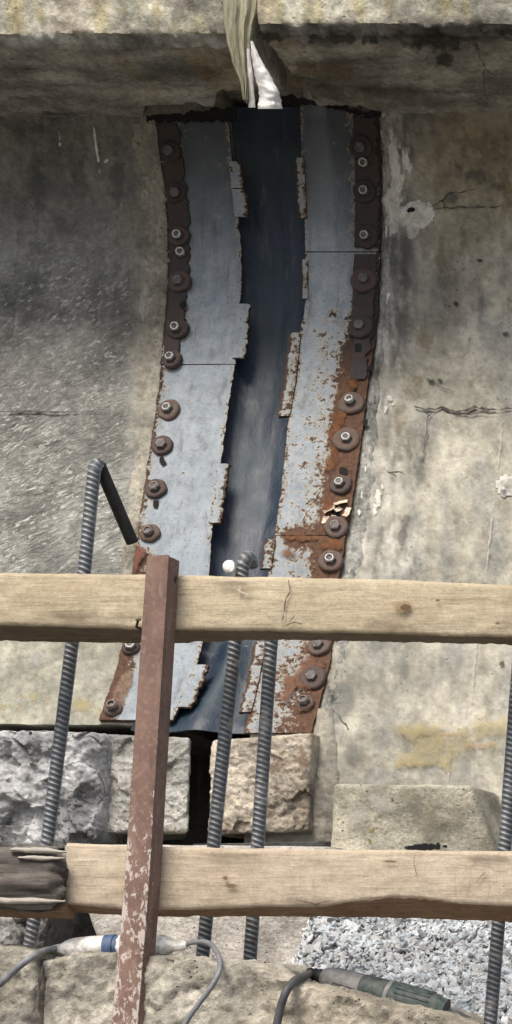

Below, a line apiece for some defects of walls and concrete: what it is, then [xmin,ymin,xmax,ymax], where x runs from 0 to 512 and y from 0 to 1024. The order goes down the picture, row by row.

spalling [399,200,435,239]
crack [430,189,501,209]
corrosion [324,406,346,470]
crack [414,383,512,458]
corrosion [113,670,132,705]
corrosion [280,655,322,711]